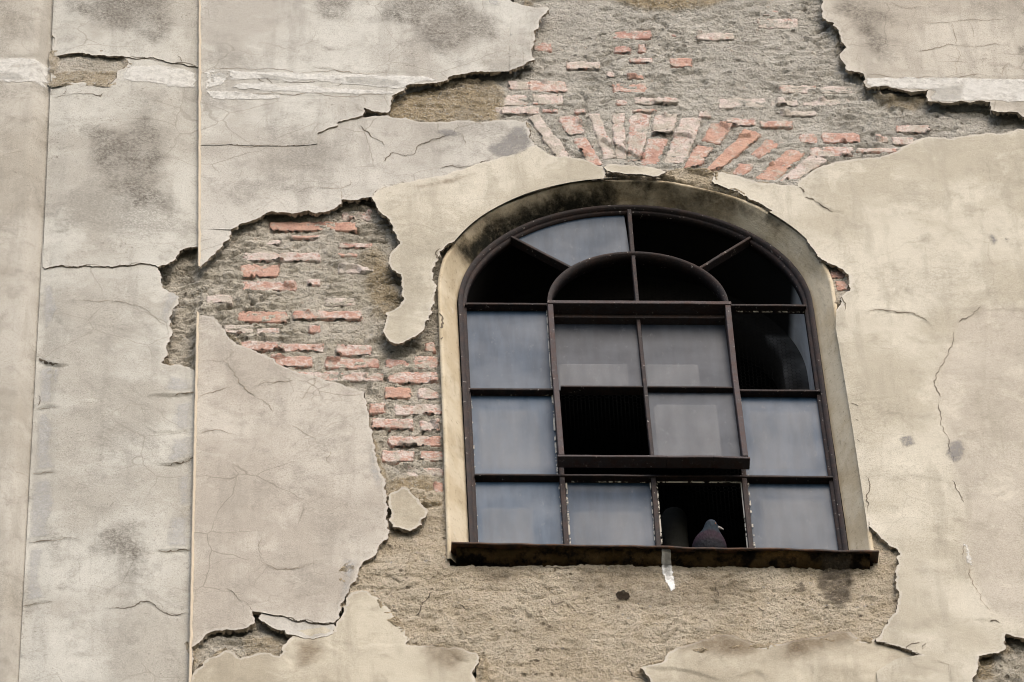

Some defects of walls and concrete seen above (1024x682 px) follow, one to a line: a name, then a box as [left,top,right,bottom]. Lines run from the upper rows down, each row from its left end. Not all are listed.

crack [362,123,484,167]
spalling [0,0,1024,219]
crack [175,352,316,410]
spalling [158,165,899,682]
crack [934,308,979,498]